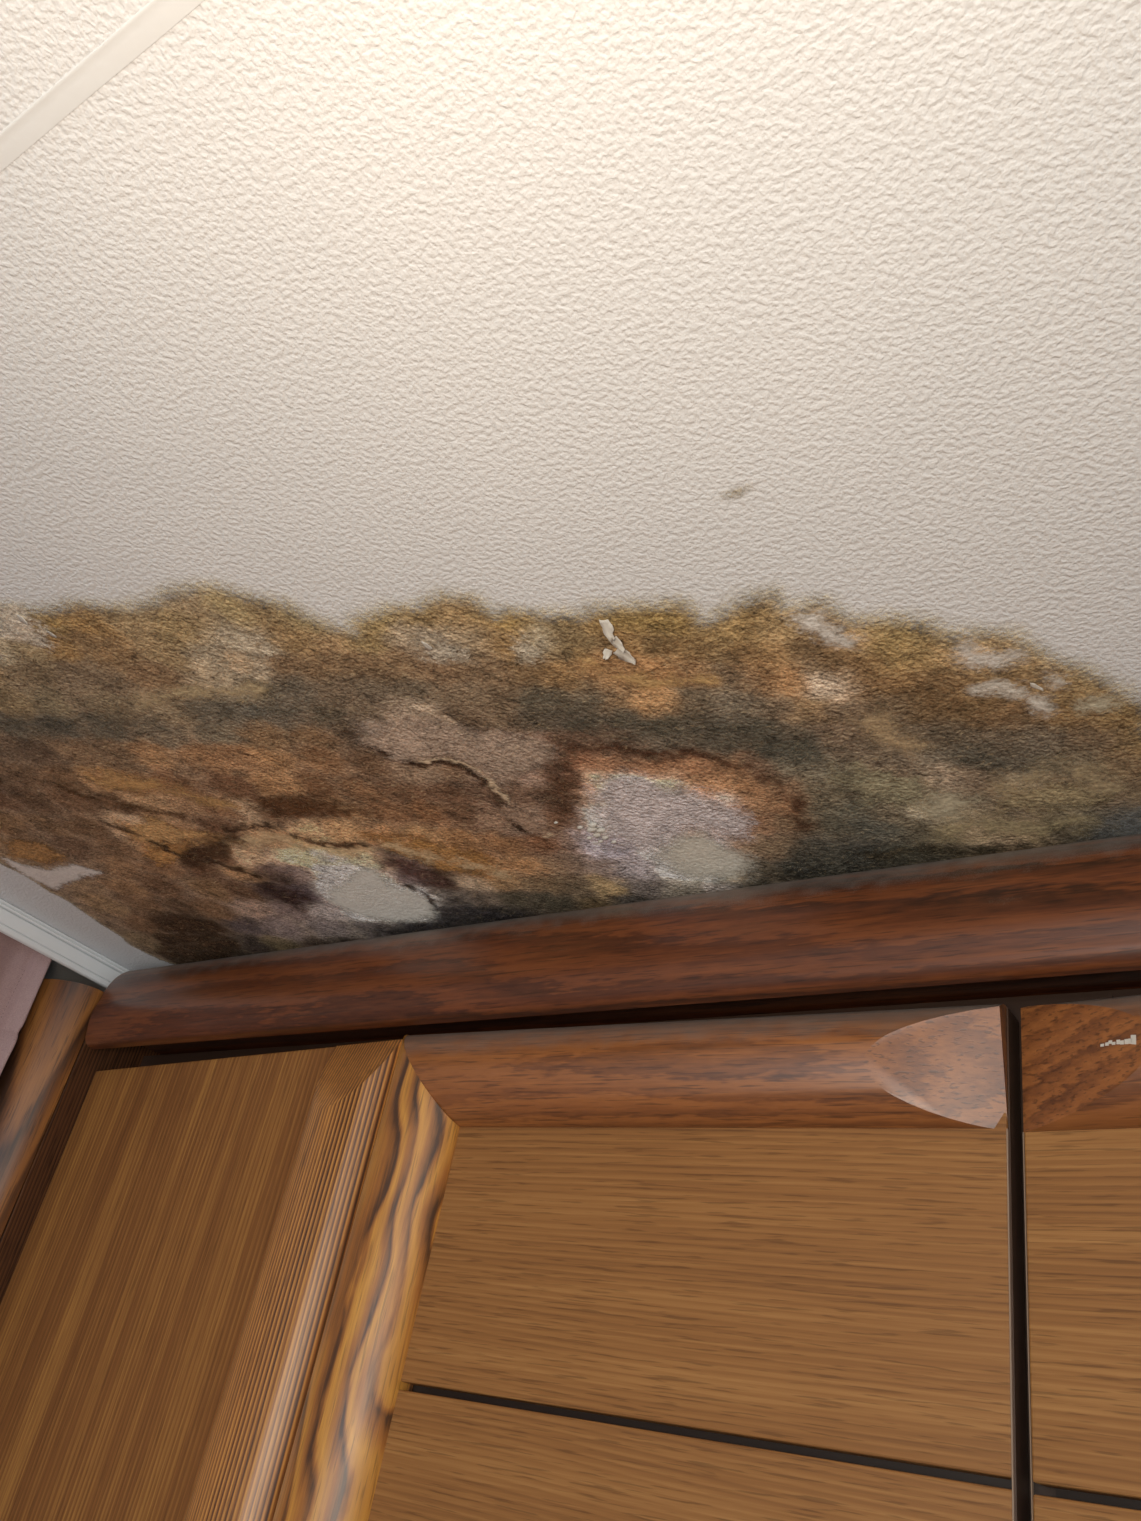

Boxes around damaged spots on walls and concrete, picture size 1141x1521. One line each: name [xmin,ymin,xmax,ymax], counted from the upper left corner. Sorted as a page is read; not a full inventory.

water stain [0,582,1141,965]